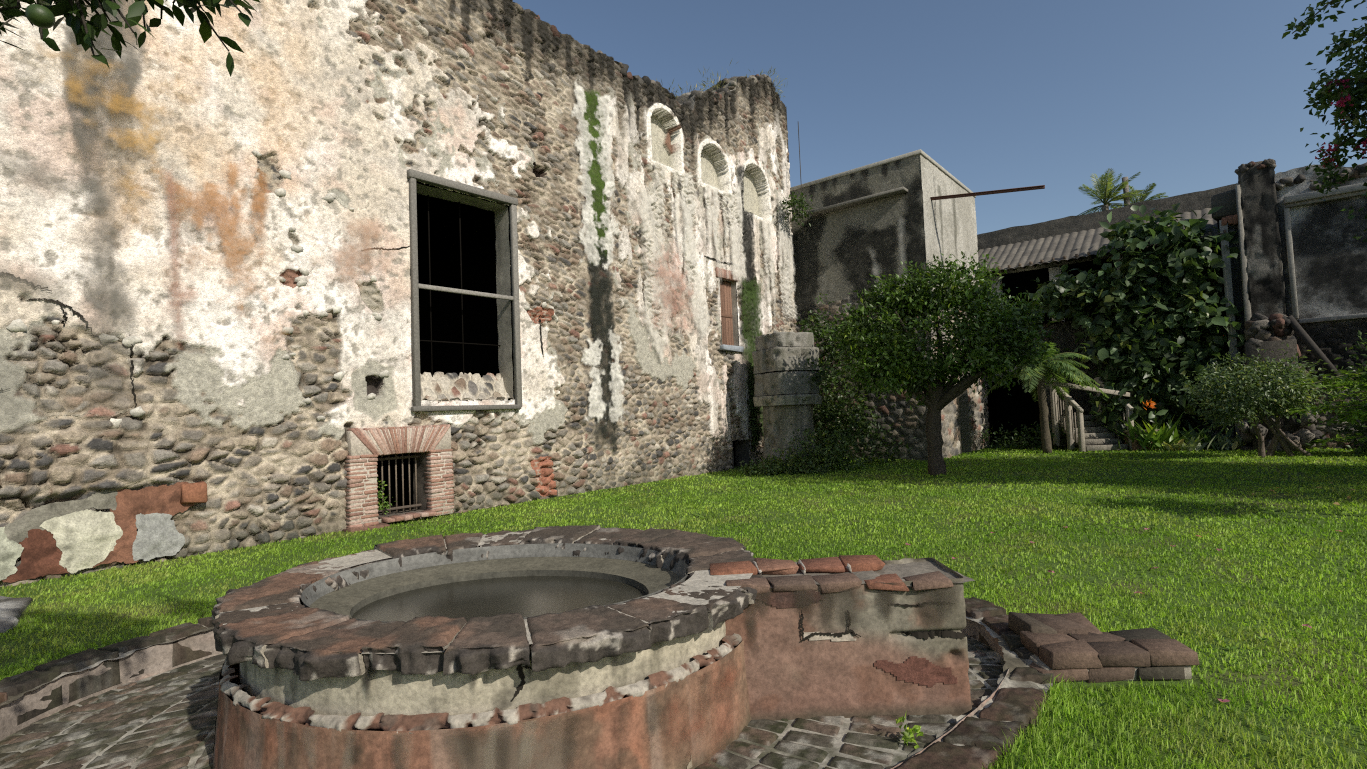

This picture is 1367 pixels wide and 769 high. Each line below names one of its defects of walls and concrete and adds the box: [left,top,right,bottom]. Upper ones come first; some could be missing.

crack [0,271,92,331]
spalling [6,319,145,429]
leakage [62,0,141,378]
crack [129,334,137,408]
spalling [281,306,346,421]
spalling [524,302,555,324]
leakage [450,0,787,451]
leakage [640,160,900,360]
leakage [834,179,926,309]
peeling [1,481,208,583]
crack [511,664,532,702]